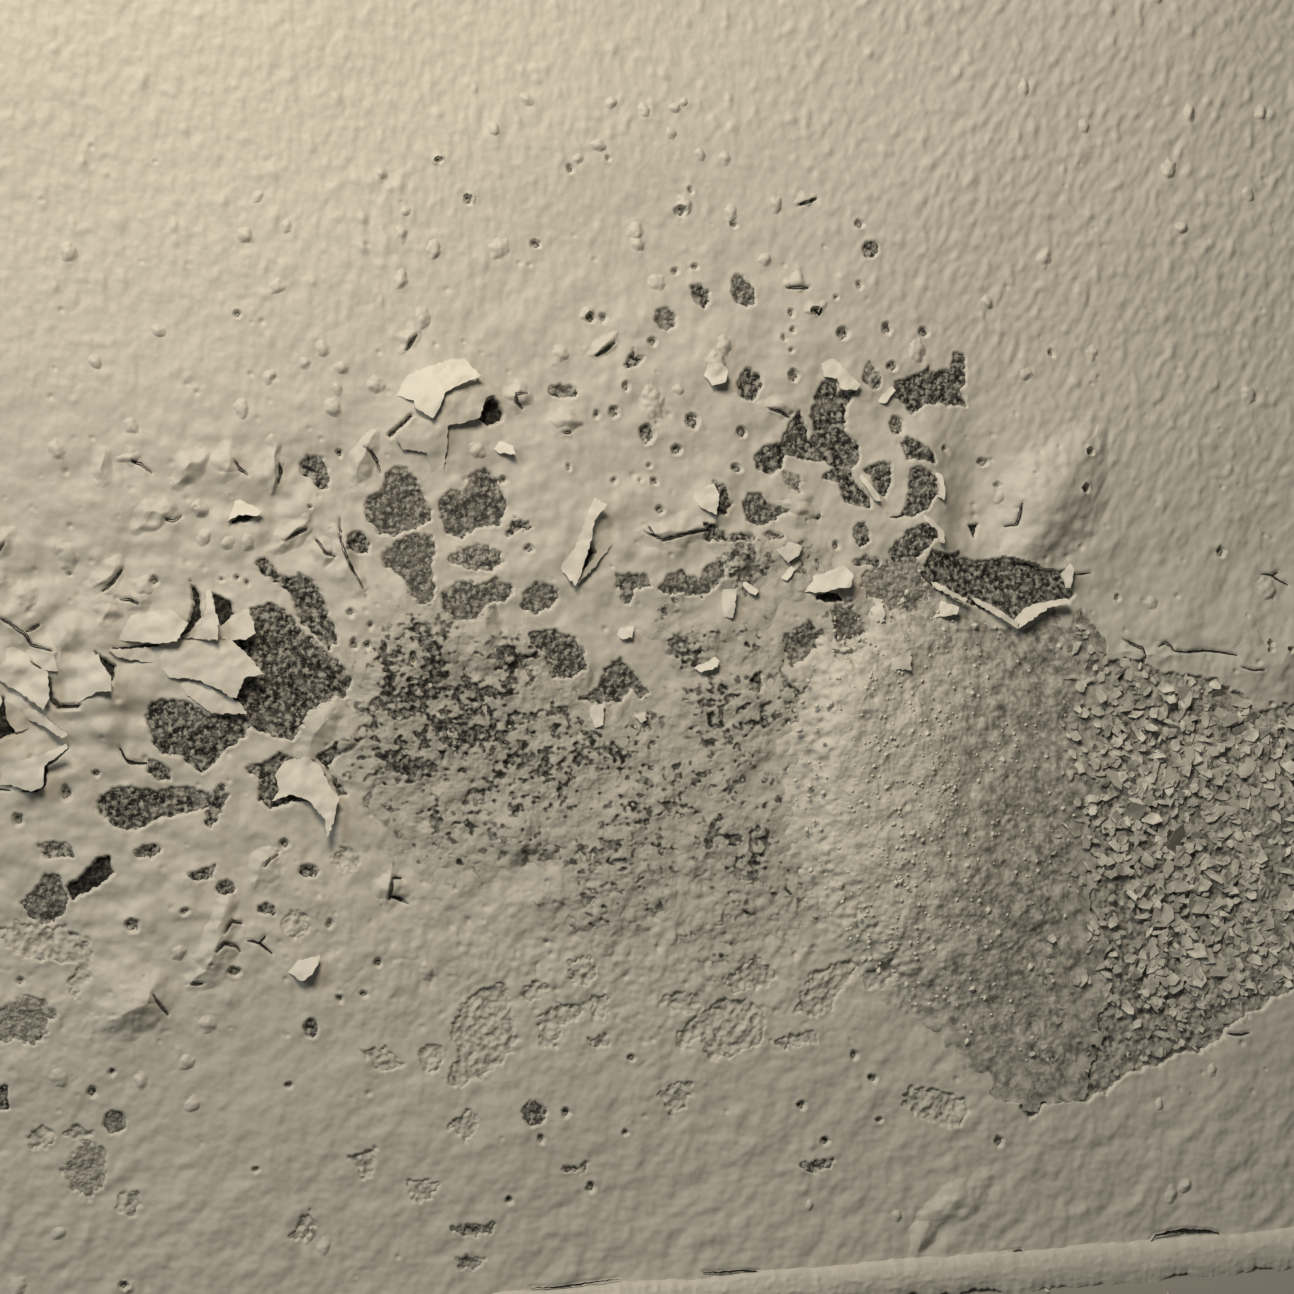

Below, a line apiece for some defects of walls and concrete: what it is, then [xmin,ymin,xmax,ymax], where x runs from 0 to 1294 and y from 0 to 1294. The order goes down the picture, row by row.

spalling [622,308,676,391]
crack [1173,649,1265,671]
spalling [0,353,1294,1102]
spalling [0,1085,9,1110]
spalling [448,1109,478,1141]
spalling [521,1101,547,1142]
spalling [658,1082,694,1116]
spalling [902,1086,969,1126]